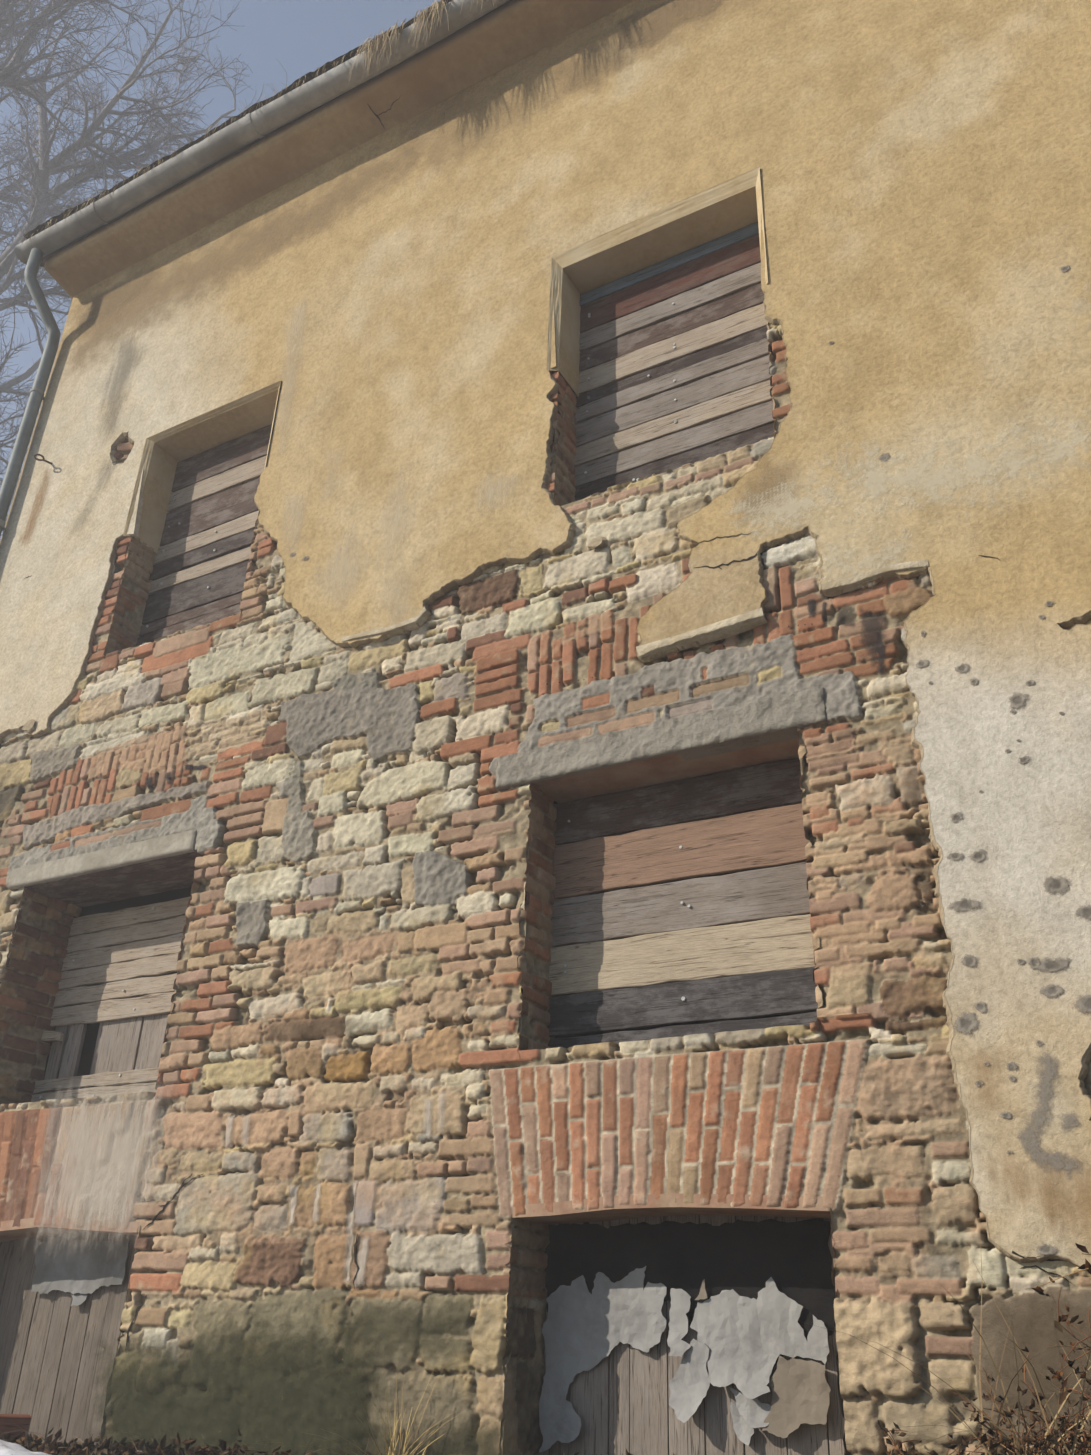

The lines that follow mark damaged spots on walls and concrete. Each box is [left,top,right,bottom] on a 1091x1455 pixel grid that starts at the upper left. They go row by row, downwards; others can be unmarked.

crack [692,531,764,569]
spalling [0,297,1091,1277]
water stain [1018,1054,1080,1178]
peeling [31,1233,130,1306]
peeling [539,1266,831,1453]